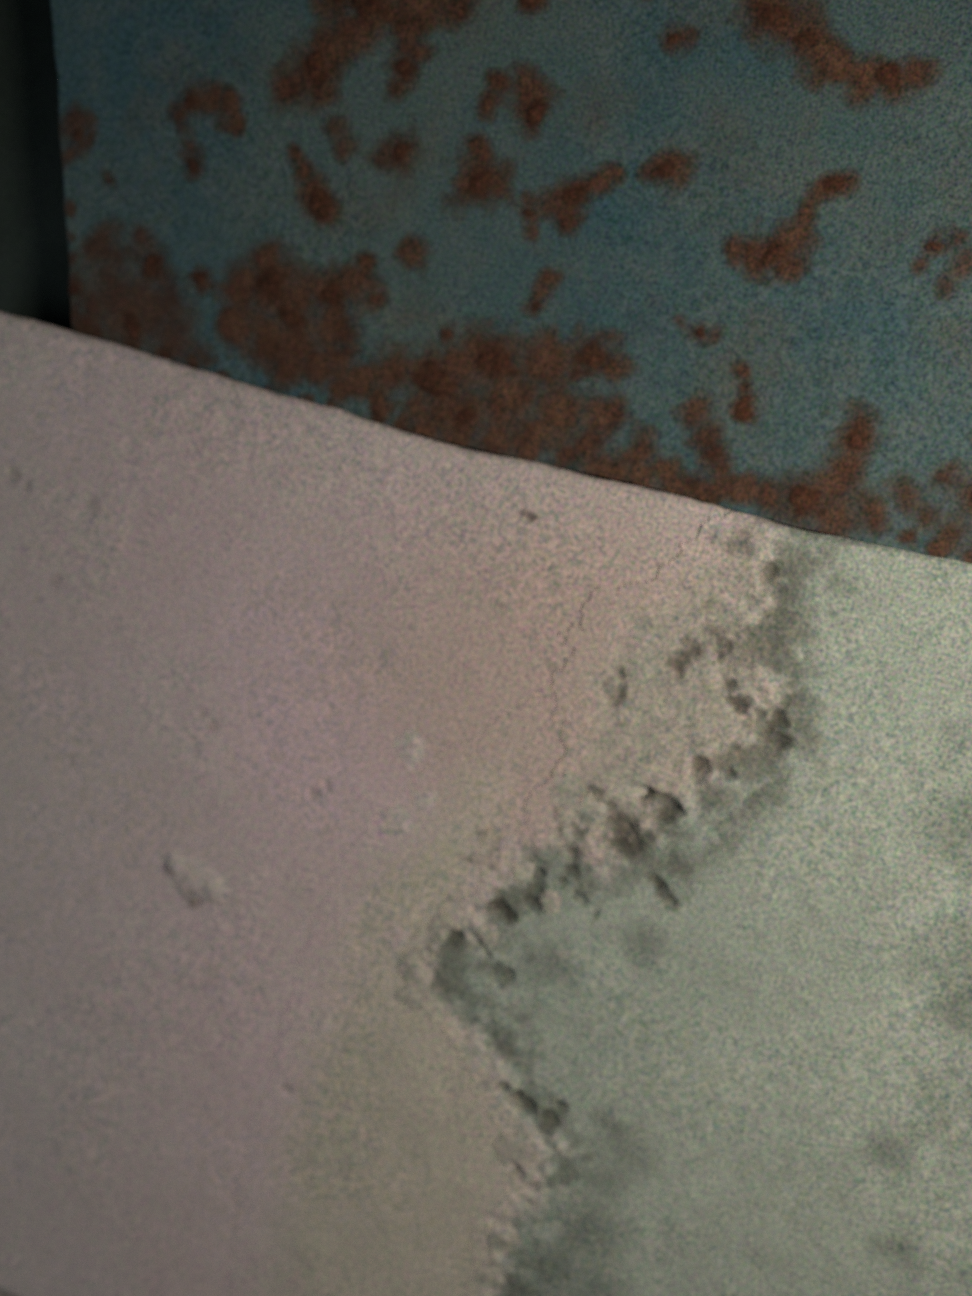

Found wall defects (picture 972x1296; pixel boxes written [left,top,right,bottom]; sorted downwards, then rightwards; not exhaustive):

corrosion [172,84,245,177]
corrosion [289,145,339,224]
corrosion [273,0,470,104]
corrosion [480,66,552,135]
corrosion [456,136,624,239]
corrosion [640,153,691,184]
corrosion [725,173,857,281]
corrosion [746,0,935,103]
corrosion [69,236,98,338]
corrosion [192,243,884,536]
corrosion [897,482,972,564]
spalling [396,511,972,1296]